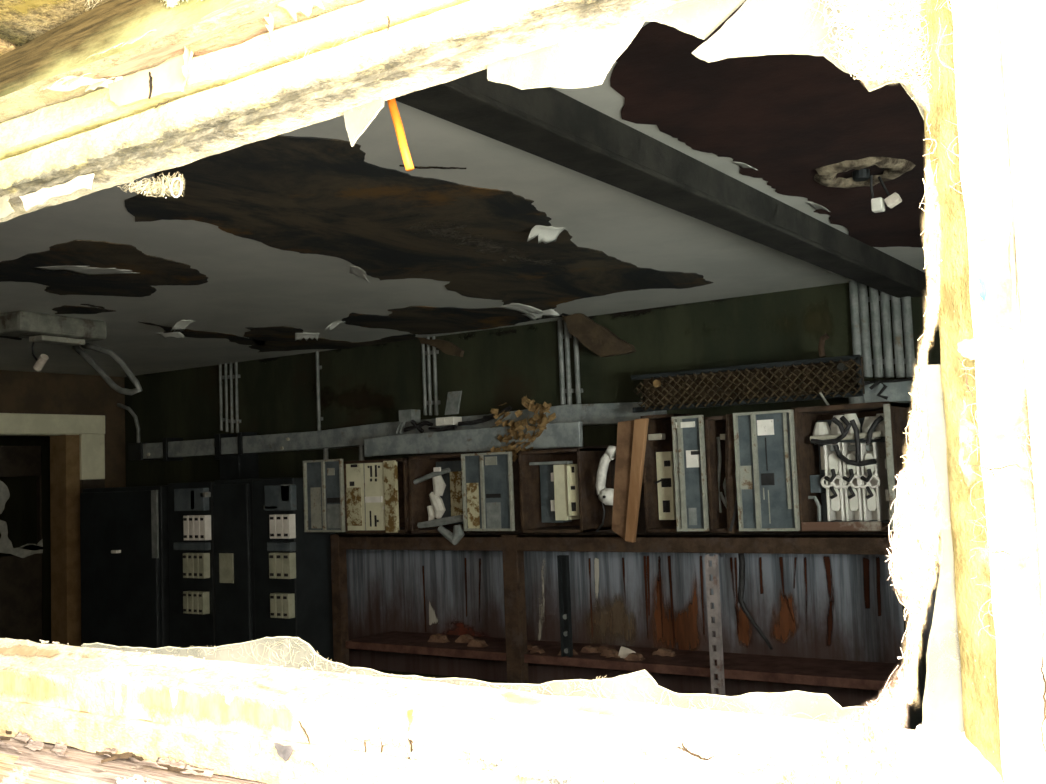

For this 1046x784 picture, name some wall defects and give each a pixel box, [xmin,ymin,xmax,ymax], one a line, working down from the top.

peeling [37,0,325,108]
peeling [610,0,926,248]
peeling [19,173,94,211]
peeling [0,240,208,314]
peeling [125,135,713,352]
rust [587,556,705,651]
rust [730,557,751,647]
peeling [129,655,208,671]
peeling [114,774,166,784]